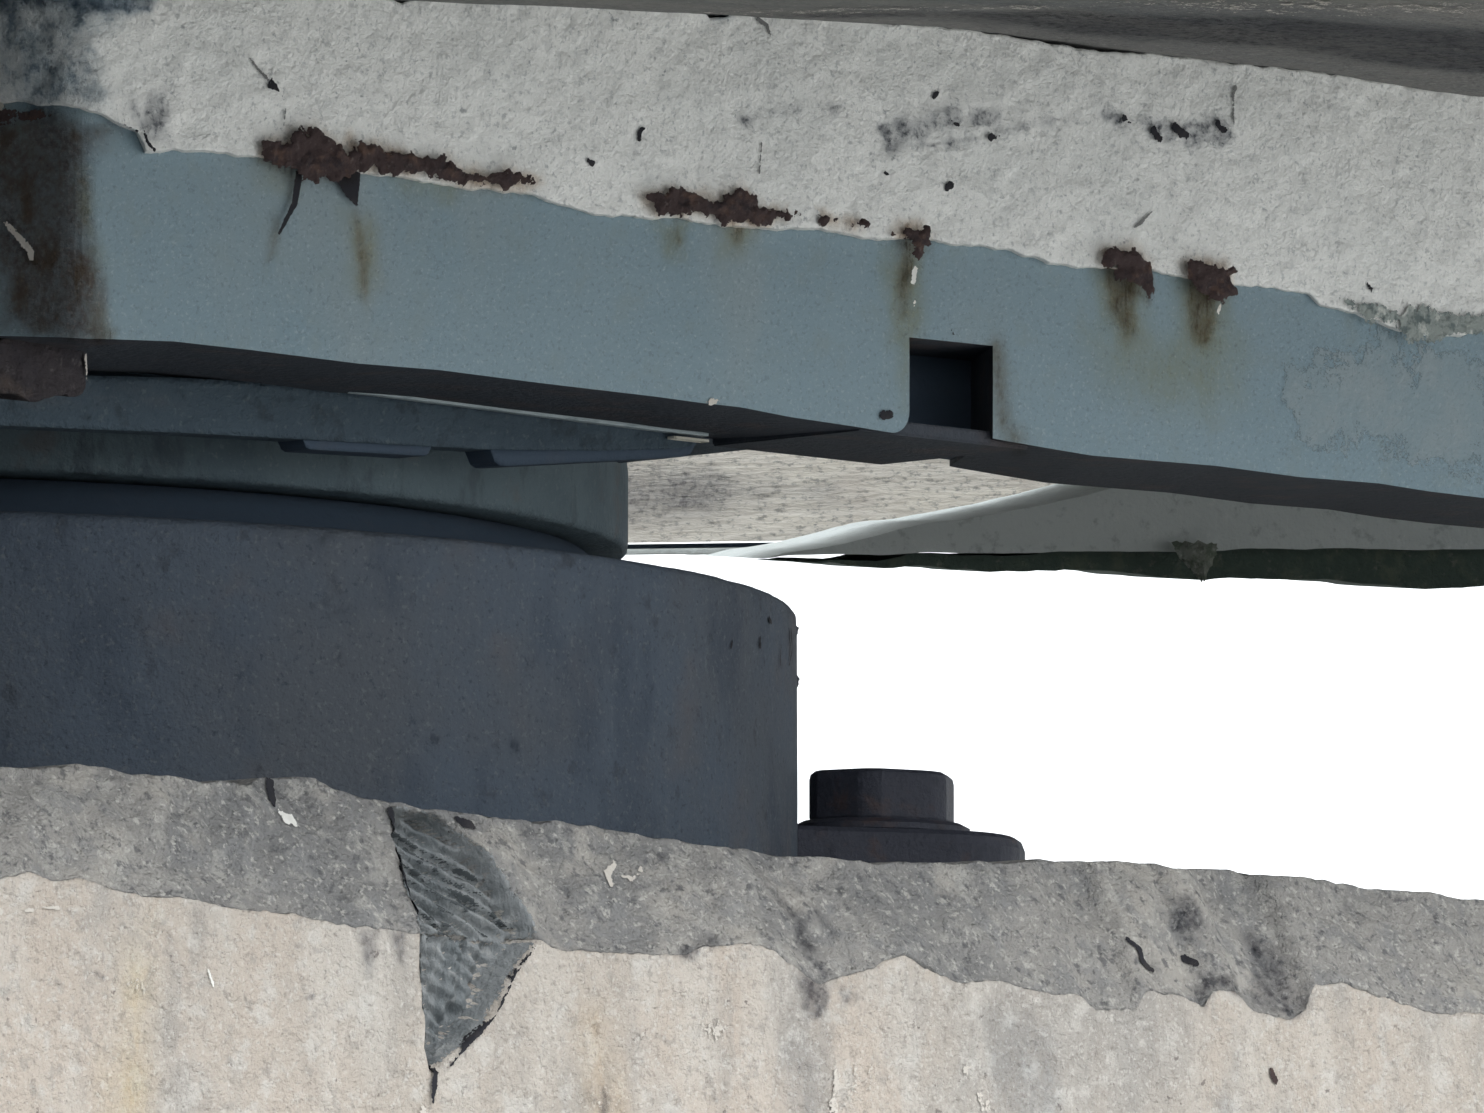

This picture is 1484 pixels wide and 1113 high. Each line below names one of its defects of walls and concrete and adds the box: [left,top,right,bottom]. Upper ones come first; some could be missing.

rust [0,103,76,310]
rust [261,125,536,235]
rust [646,186,870,228]
rust [891,225,931,306]
rust [1101,246,1155,321]
rust [1187,259,1238,327]
spalling [387,806,537,1104]